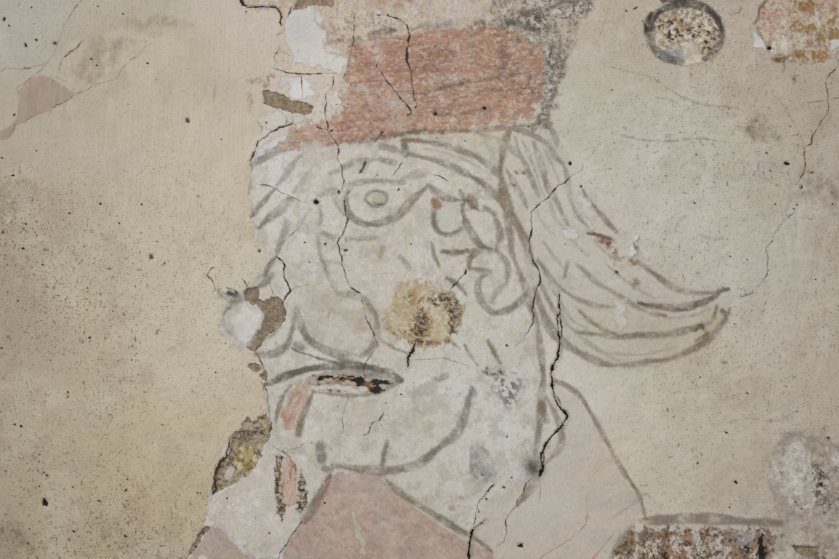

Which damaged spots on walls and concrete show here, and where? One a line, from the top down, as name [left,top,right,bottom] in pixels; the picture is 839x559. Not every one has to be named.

peeling [252,0,349,162]
crack [376,14,417,116]
peeling [752,32,771,50]
crack [274,16,402,293]
crack [528,178,569,332]
spalling [229,287,286,351]
spalling [248,362,268,381]
spalling [211,414,272,499]
crack [499,294,569,545]
spalling [190,526,210,559]
crack [467,485,494,559]
spalling [791,545,825,559]